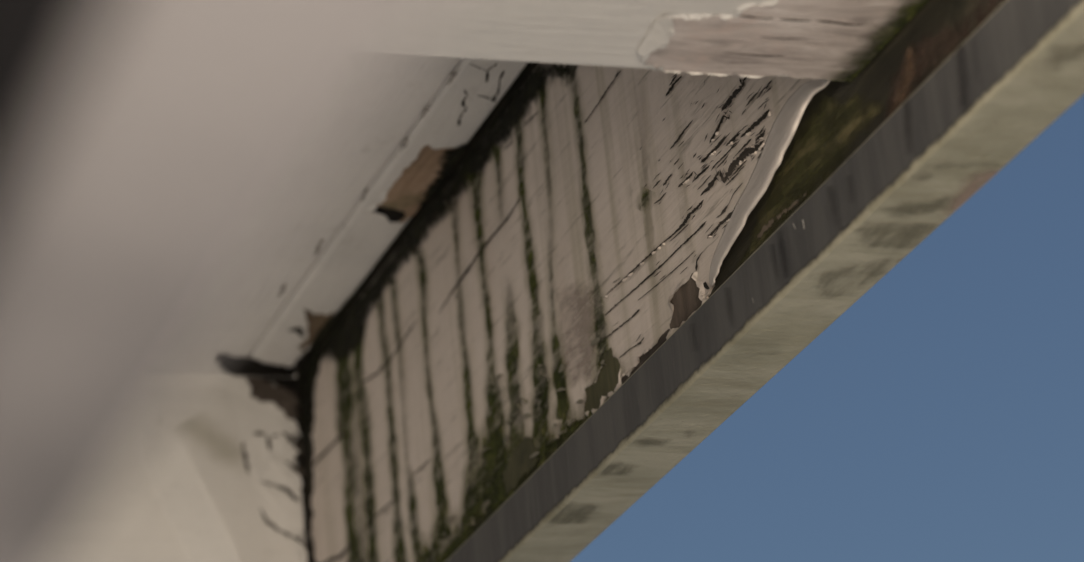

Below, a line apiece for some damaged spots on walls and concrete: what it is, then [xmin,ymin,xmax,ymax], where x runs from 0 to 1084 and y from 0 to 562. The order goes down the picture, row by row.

crack [457,64,504,126]
peeling [636,0,915,81]
peeling [362,145,454,223]
water stain [302,62,608,562]
peeling [584,271,710,416]
peeling [214,309,334,562]
crack [242,406,394,562]